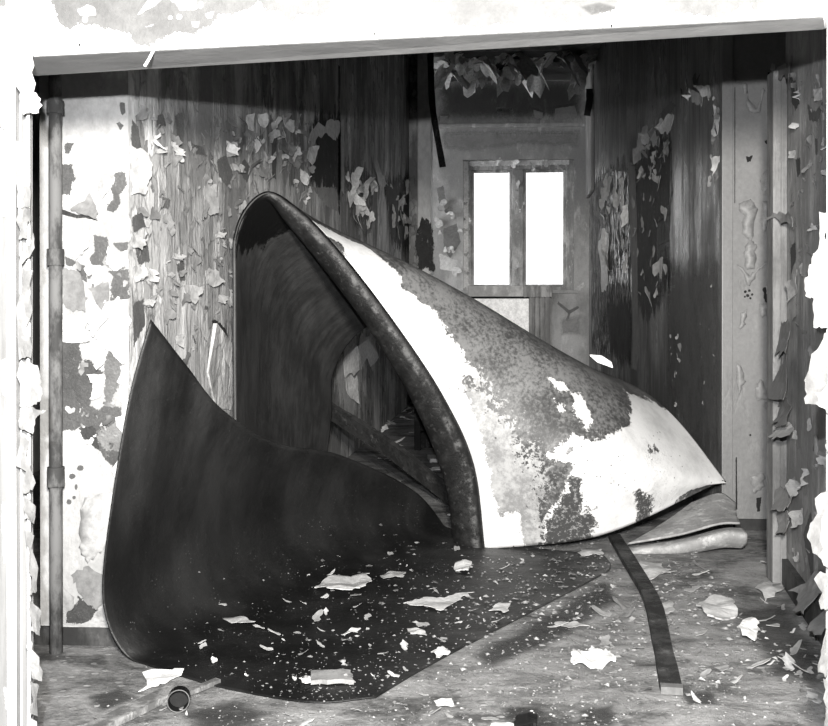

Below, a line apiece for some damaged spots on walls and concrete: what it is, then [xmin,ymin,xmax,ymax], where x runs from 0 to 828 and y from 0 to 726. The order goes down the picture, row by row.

peeling [3,0,42,115]
peeling [51,0,331,48]
peeling [434,50,597,120]
damp [584,4,614,13]
peeling [590,71,720,370]
peeling [62,102,569,478]
peeling [764,134,828,440]
peeling [14,141,47,726]
peeling [63,566,108,628]
peeling [314,571,406,590]
peeling [405,592,473,611]
peeling [755,418,828,726]